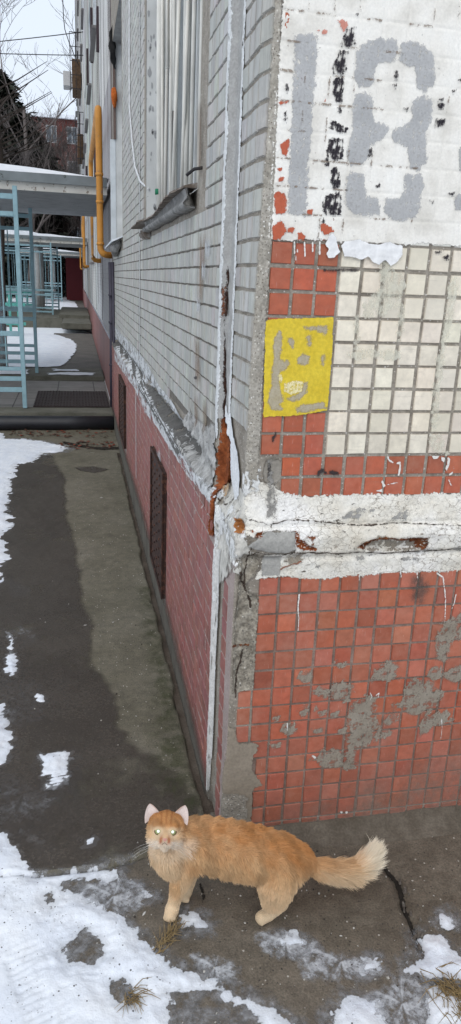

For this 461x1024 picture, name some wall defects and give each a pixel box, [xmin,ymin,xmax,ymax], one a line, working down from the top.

spalling [207,0,317,694]
crack [217,497,461,608]
spalling [356,535,429,561]
crack [234,649,243,698]